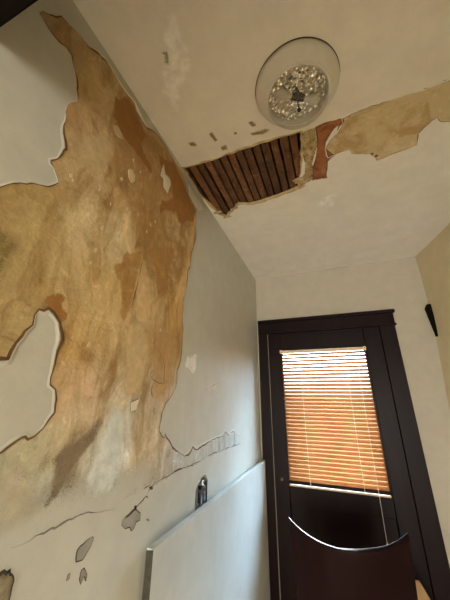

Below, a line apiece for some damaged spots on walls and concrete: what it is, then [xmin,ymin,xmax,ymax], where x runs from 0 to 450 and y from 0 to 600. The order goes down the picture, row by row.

leakage [109,115,194,301]
peeling [0,9,305,537]
leakage [32,417,102,509]
spalling [0,568,14,600]
crack [13,510,108,548]
peeling [75,536,94,585]